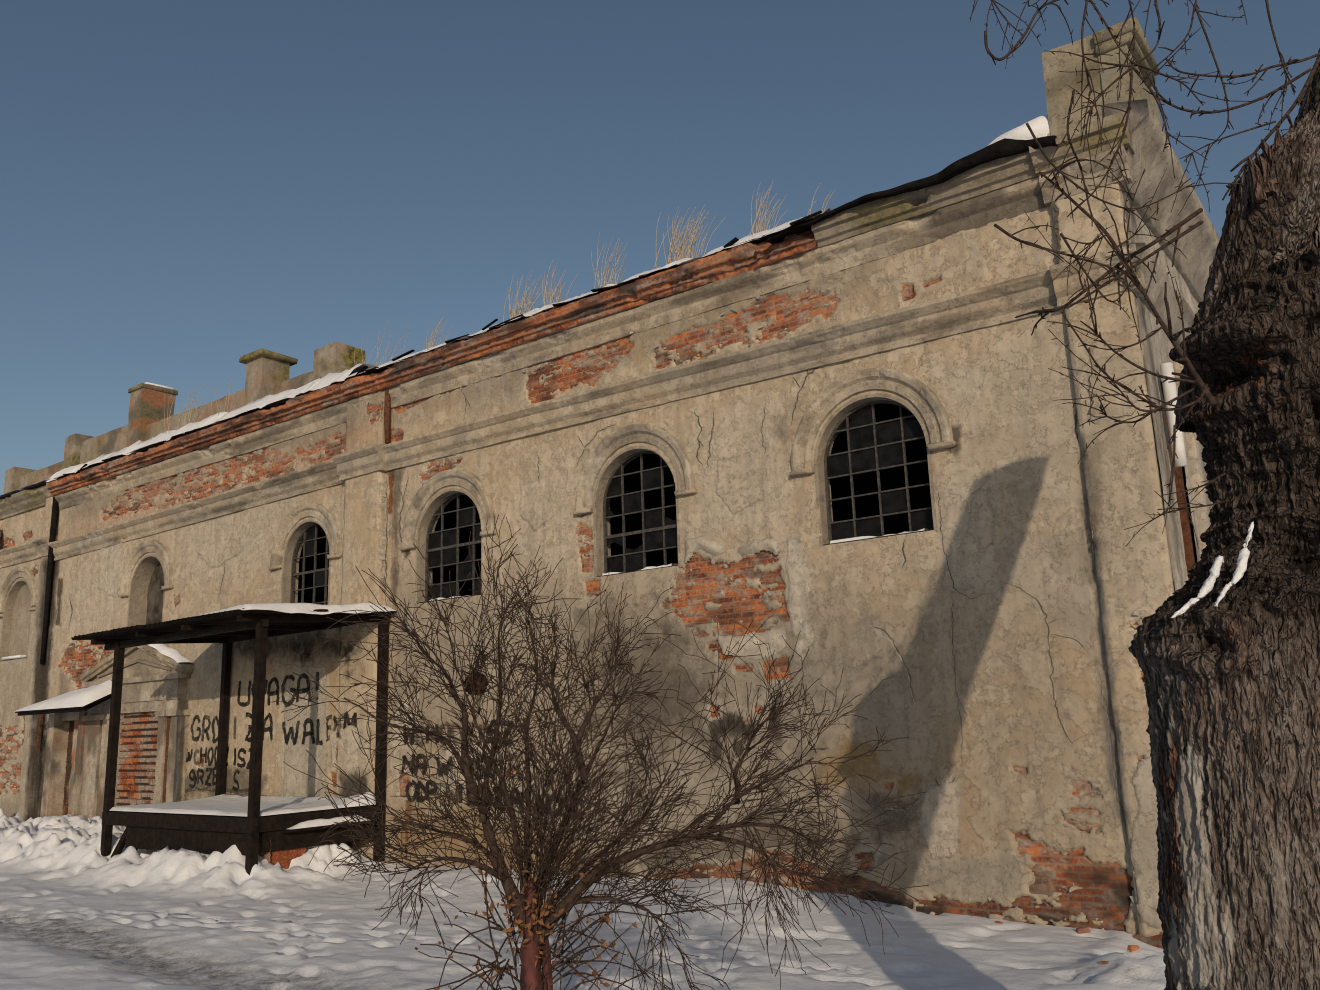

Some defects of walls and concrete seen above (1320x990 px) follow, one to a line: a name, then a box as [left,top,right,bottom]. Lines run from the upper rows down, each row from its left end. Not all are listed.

flaking render [522,331,634,404]
flaking render [653,288,840,369]
flaking render [102,433,346,521]
crack [694,408,715,474]
flaking render [662,537,814,679]
flaking render [58,634,114,689]
crack [857,489,1130,861]
flaking render [0,716,25,795]
flaking render [650,756,1163,949]